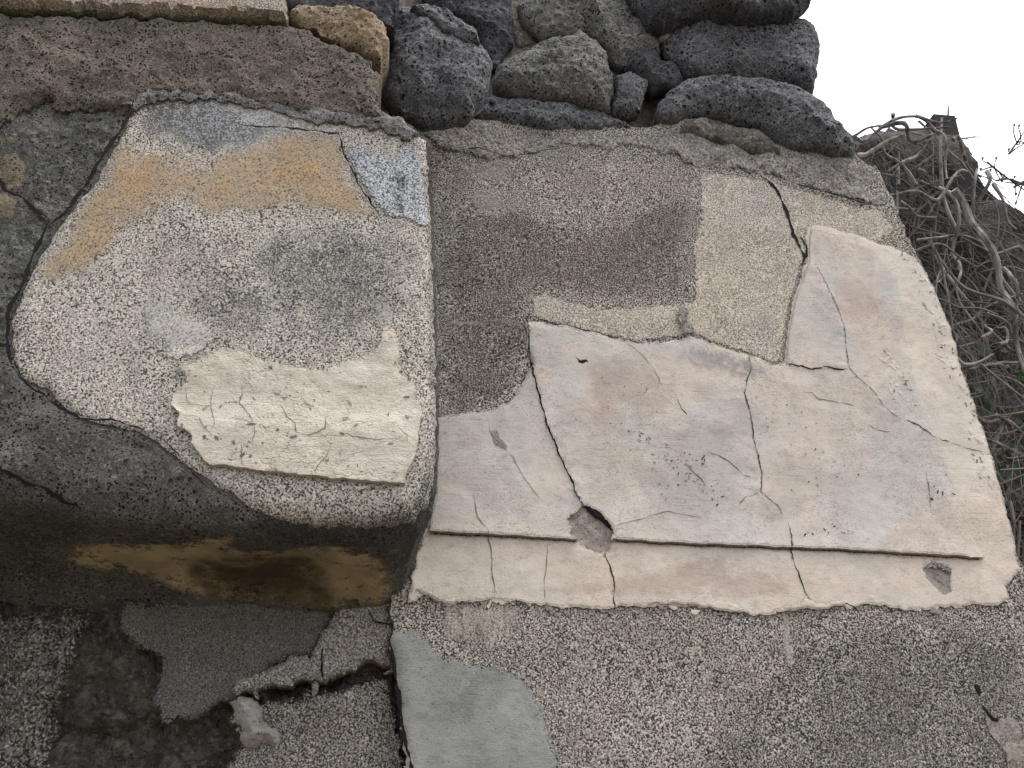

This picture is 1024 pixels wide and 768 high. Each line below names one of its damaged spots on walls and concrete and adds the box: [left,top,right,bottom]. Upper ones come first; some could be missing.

leakage [425,170,439,394]
crack [760,175,984,452]
crack [526,320,687,505]
leakage [120,437,440,725]
crack [473,494,495,598]
spalling [567,506,613,553]
crack [603,553,616,605]
flaking render [650,588,749,615]
crack [711,357,811,600]
flaking render [771,598,849,615]
spalling [914,563,971,614]
spalling [304,678,319,697]